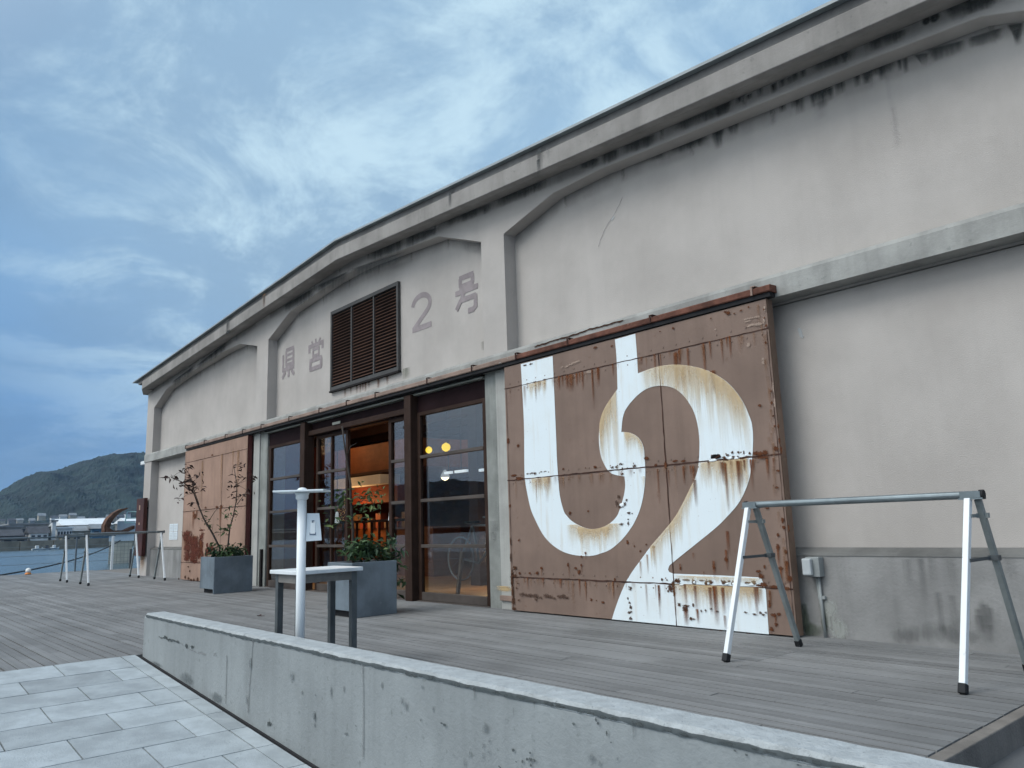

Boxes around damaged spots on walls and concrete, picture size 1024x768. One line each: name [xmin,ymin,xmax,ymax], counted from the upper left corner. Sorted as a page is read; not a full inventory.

damp [856,24,1021,79]
damp [679,70,804,126]
rust [558,368,599,385]
rust [641,336,742,406]
rust [599,391,616,433]
rust [511,474,550,484]
rust [624,390,782,567]
rust [178,505,222,581]
rust [569,511,613,537]
rust [499,539,543,610]
rust [658,518,792,631]